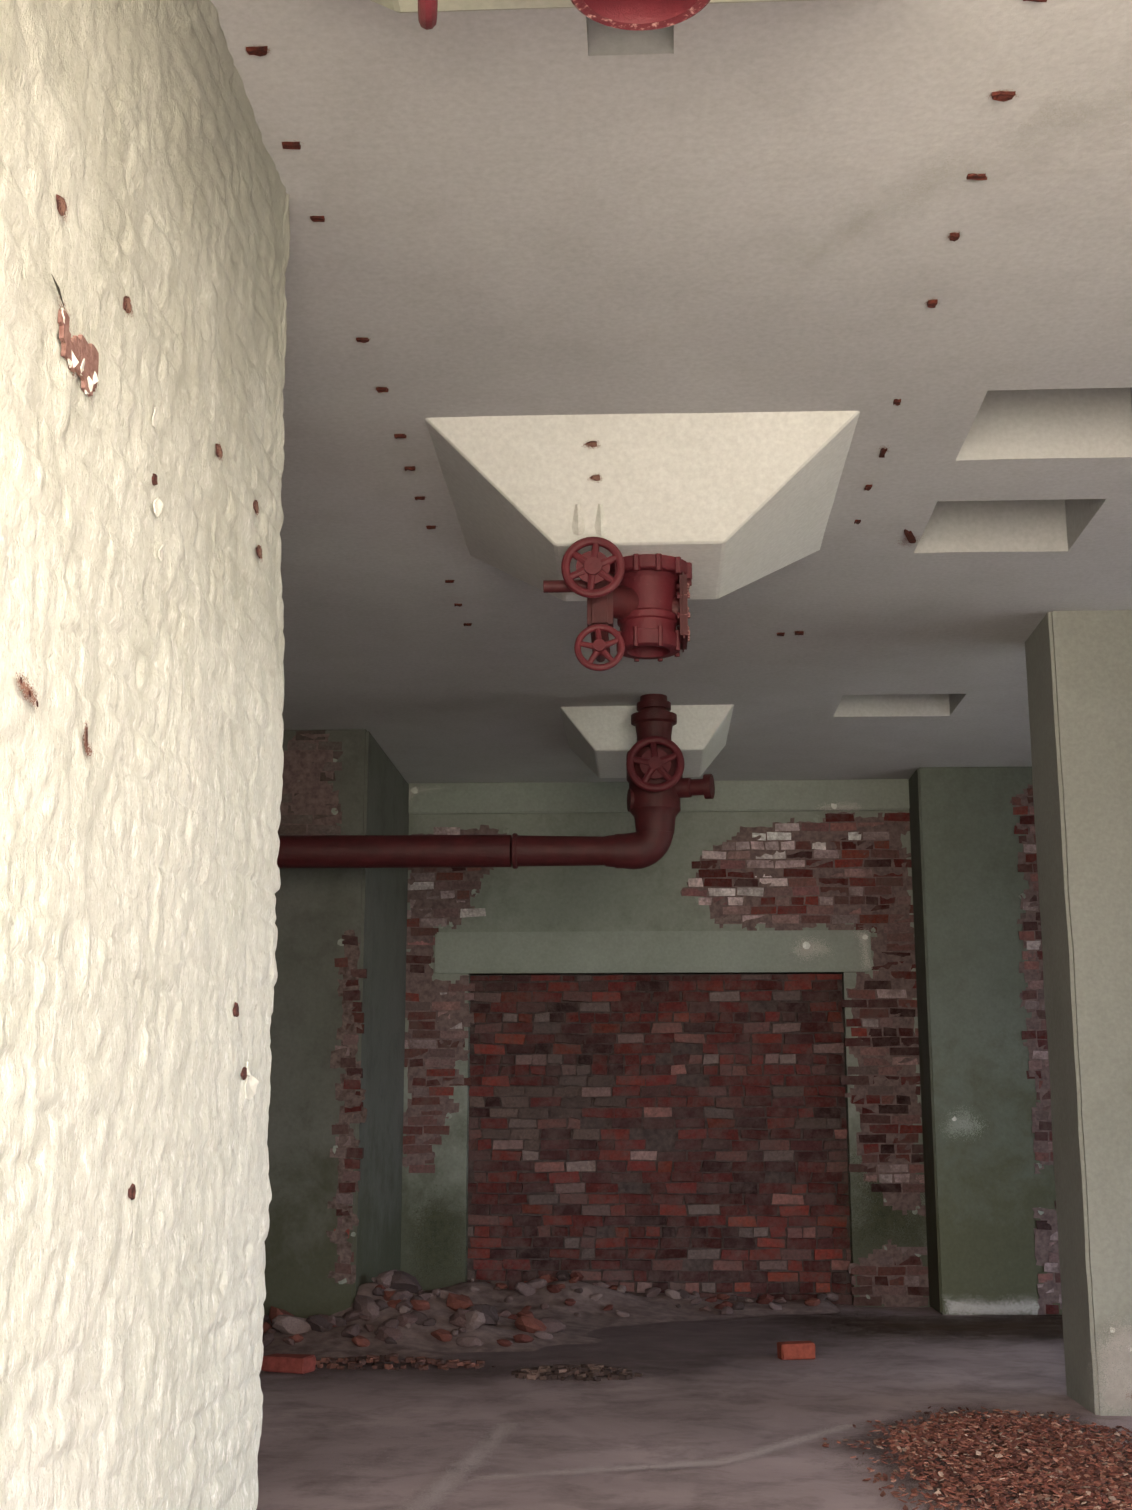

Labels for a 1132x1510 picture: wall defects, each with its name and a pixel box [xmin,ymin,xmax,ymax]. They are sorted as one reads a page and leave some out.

spalling [51,274,99,399]
spalling [326,929,367,1285]
flaking render [402,867,494,1173]
flaking render [411,825,509,835]
flaking render [680,801,988,1217]
spalling [1010,784,1054,1174]
spalling [1032,1201,1062,1316]
peeling [1087,1312,1132,1416]